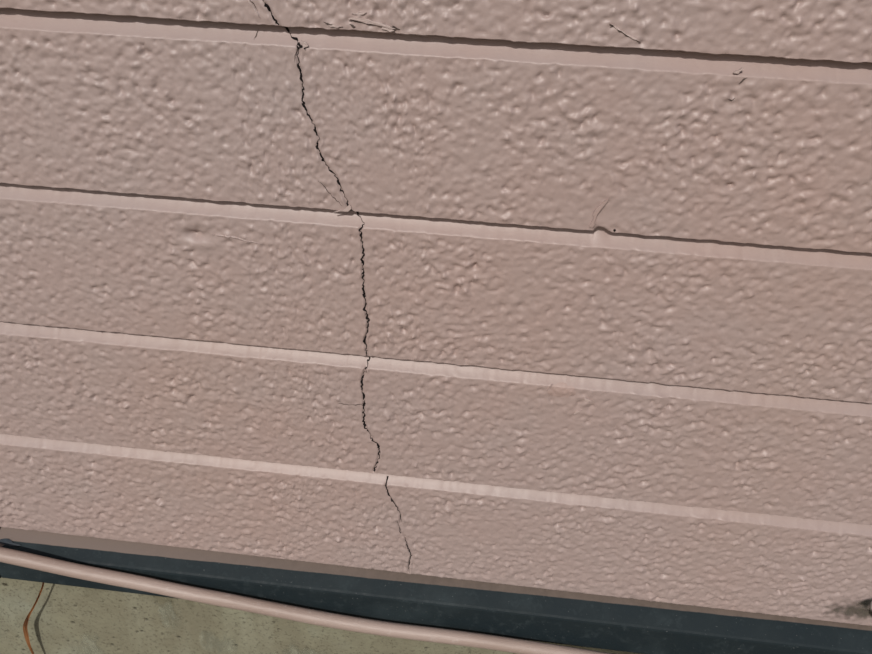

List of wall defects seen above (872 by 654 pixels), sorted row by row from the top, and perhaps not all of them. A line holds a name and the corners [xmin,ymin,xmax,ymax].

crack [264,3,412,569]